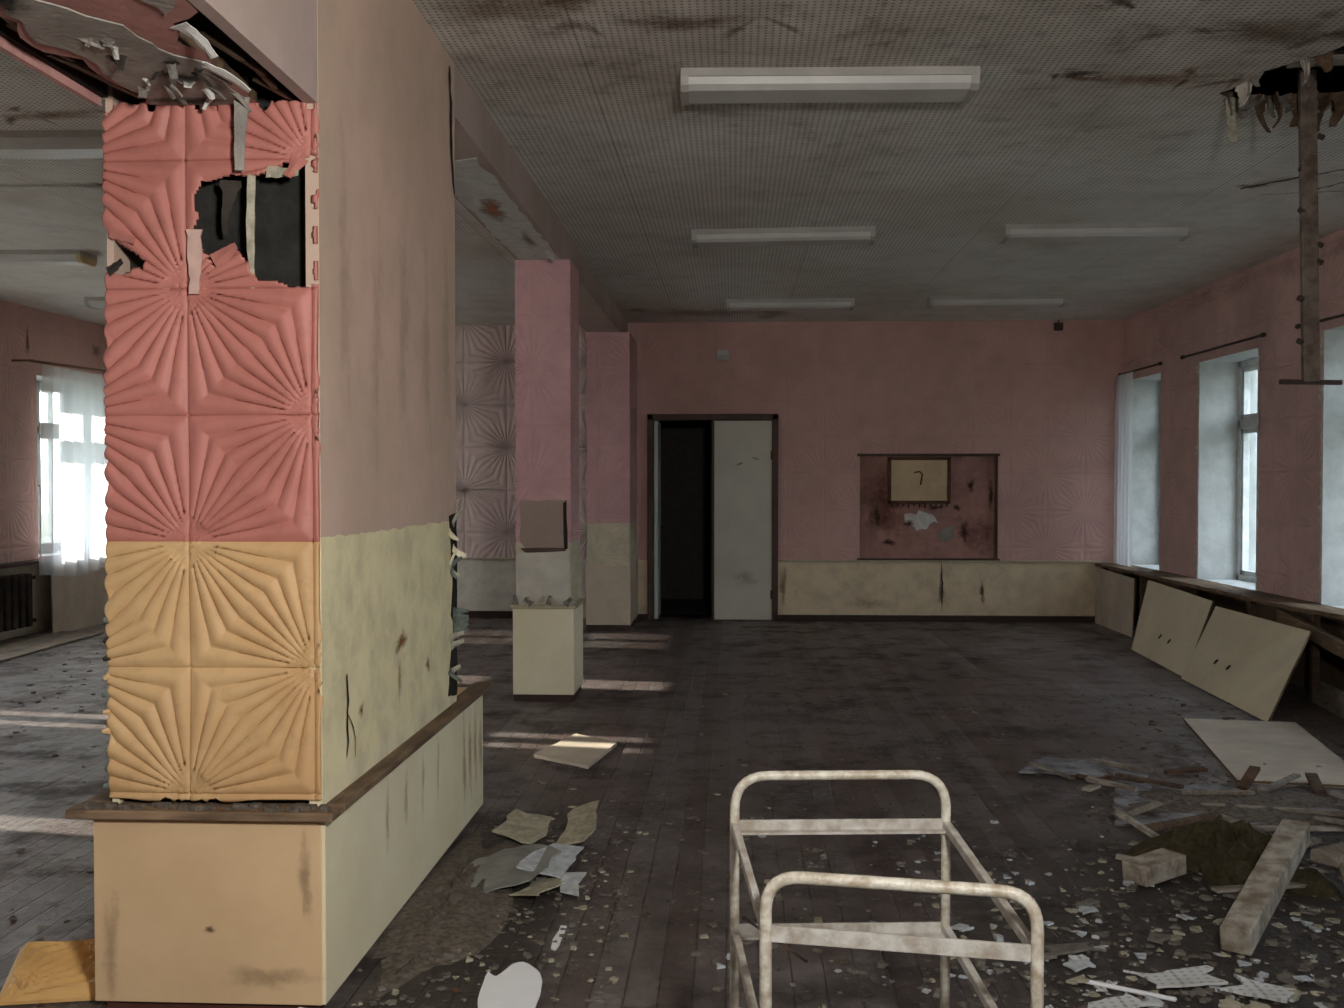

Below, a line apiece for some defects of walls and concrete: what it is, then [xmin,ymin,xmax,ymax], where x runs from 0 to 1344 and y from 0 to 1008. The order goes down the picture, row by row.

peeling [0,0,252,113]
peeling [1300,50,1335,85]
peeling [1223,72,1264,119]